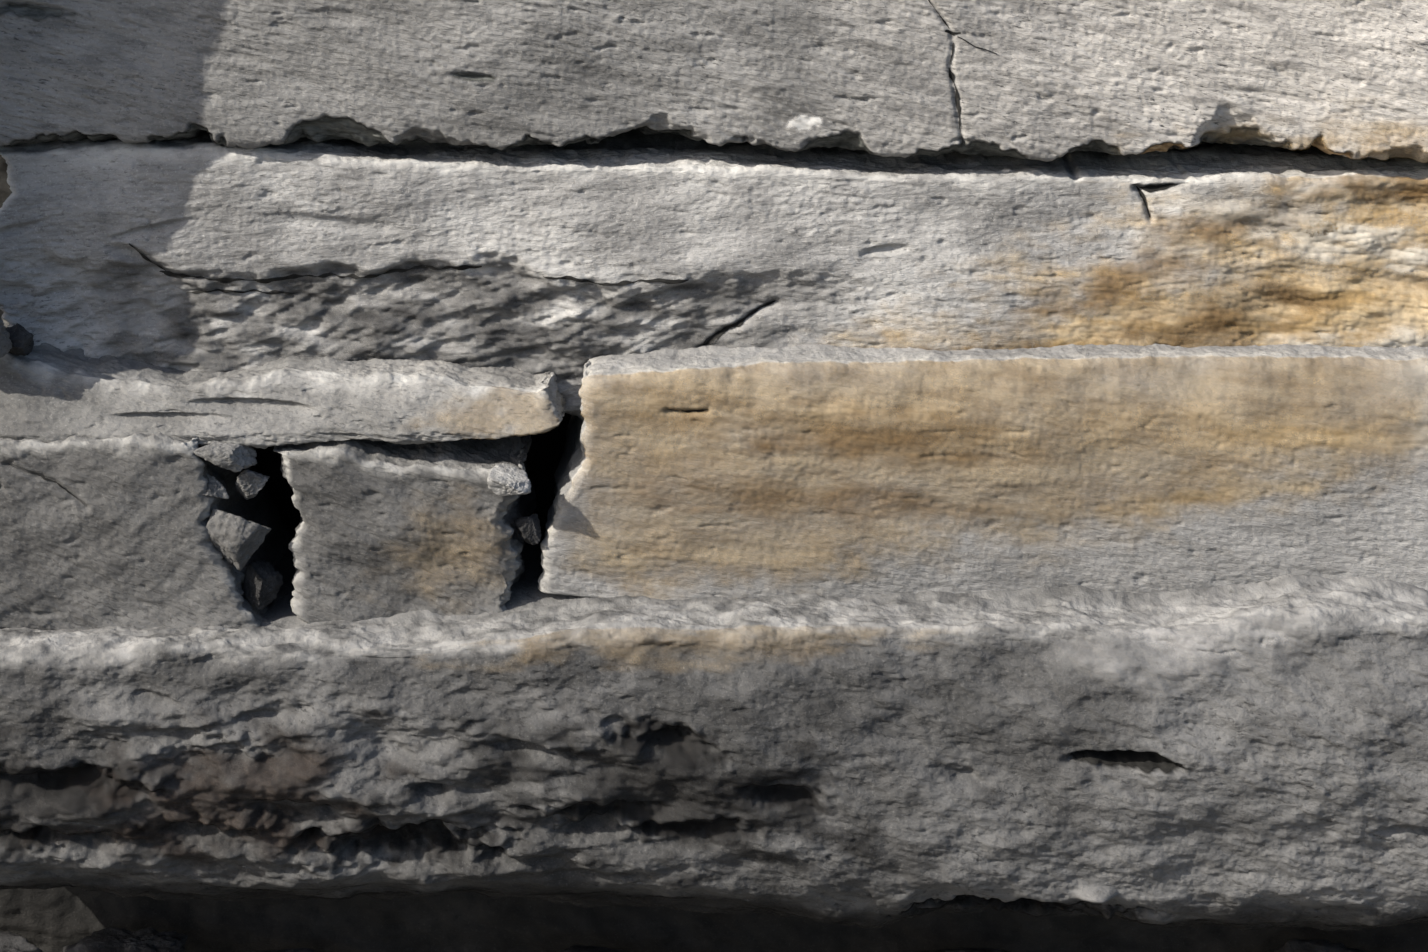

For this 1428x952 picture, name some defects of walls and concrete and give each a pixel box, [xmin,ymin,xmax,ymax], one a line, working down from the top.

crack [928,0,997,142]
crack [703,300,775,345]